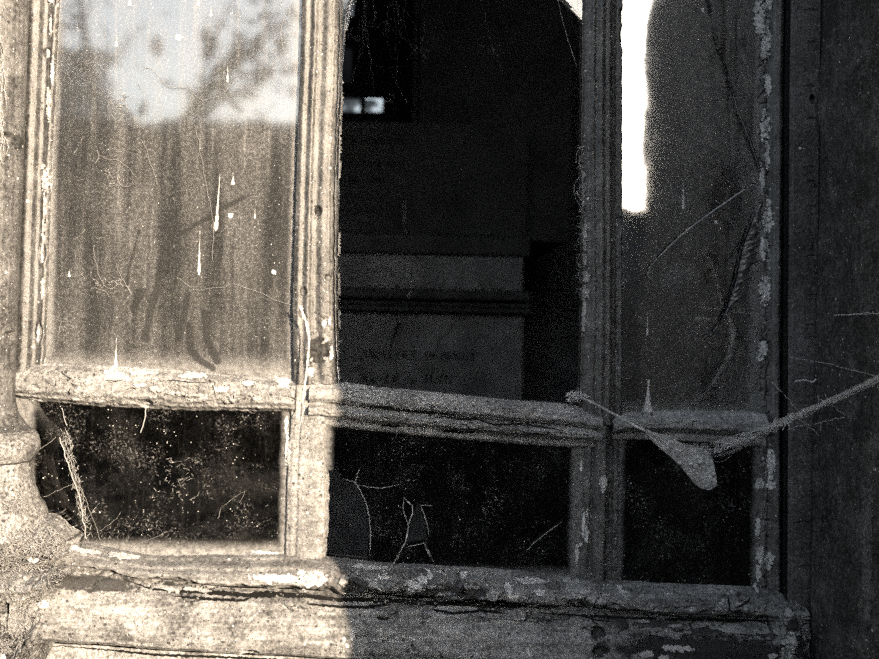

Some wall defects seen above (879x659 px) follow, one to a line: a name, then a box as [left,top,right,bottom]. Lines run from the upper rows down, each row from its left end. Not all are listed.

peeling [752,0,773,63]
peeling [764,74,772,97]
peeling [713,108,775,333]
peeling [757,340,768,361]
peeling [599,476,608,493]
peeling [575,507,590,566]
peeling [248,563,387,593]
spalling [403,570,546,603]
peeling [551,576,606,612]
spalling [765,601,812,659]
peeling [635,645,695,659]